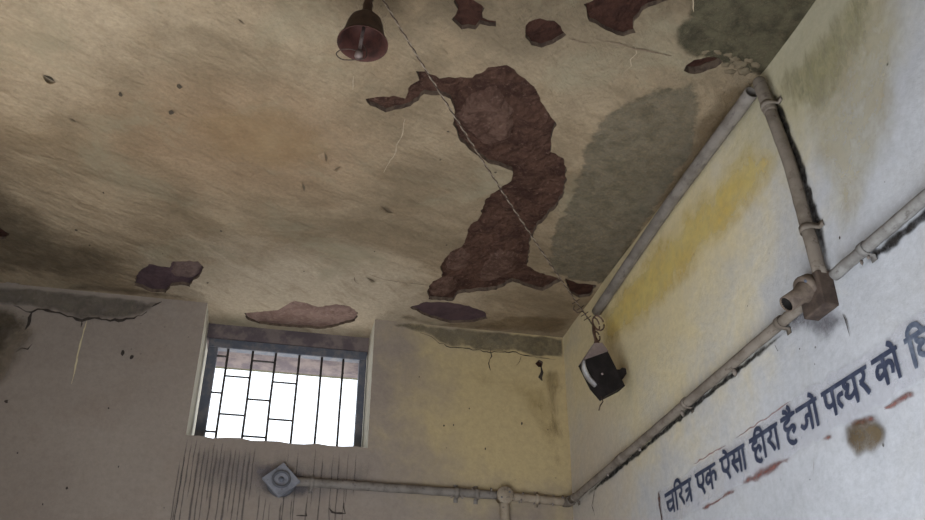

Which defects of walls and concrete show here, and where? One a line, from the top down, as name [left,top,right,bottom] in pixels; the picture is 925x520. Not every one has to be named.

flaking render [452,0,496,30]
flaking render [525,18,566,48]
flaking render [584,0,668,36]
water stain [678,0,816,74]
flaking render [684,50,761,76]
water stain [549,85,722,283]
flaking render [366,65,596,381]
flaking render [134,261,209,293]
water stain [0,290,158,317]
crack [16,302,161,352]
rust [847,423,883,454]